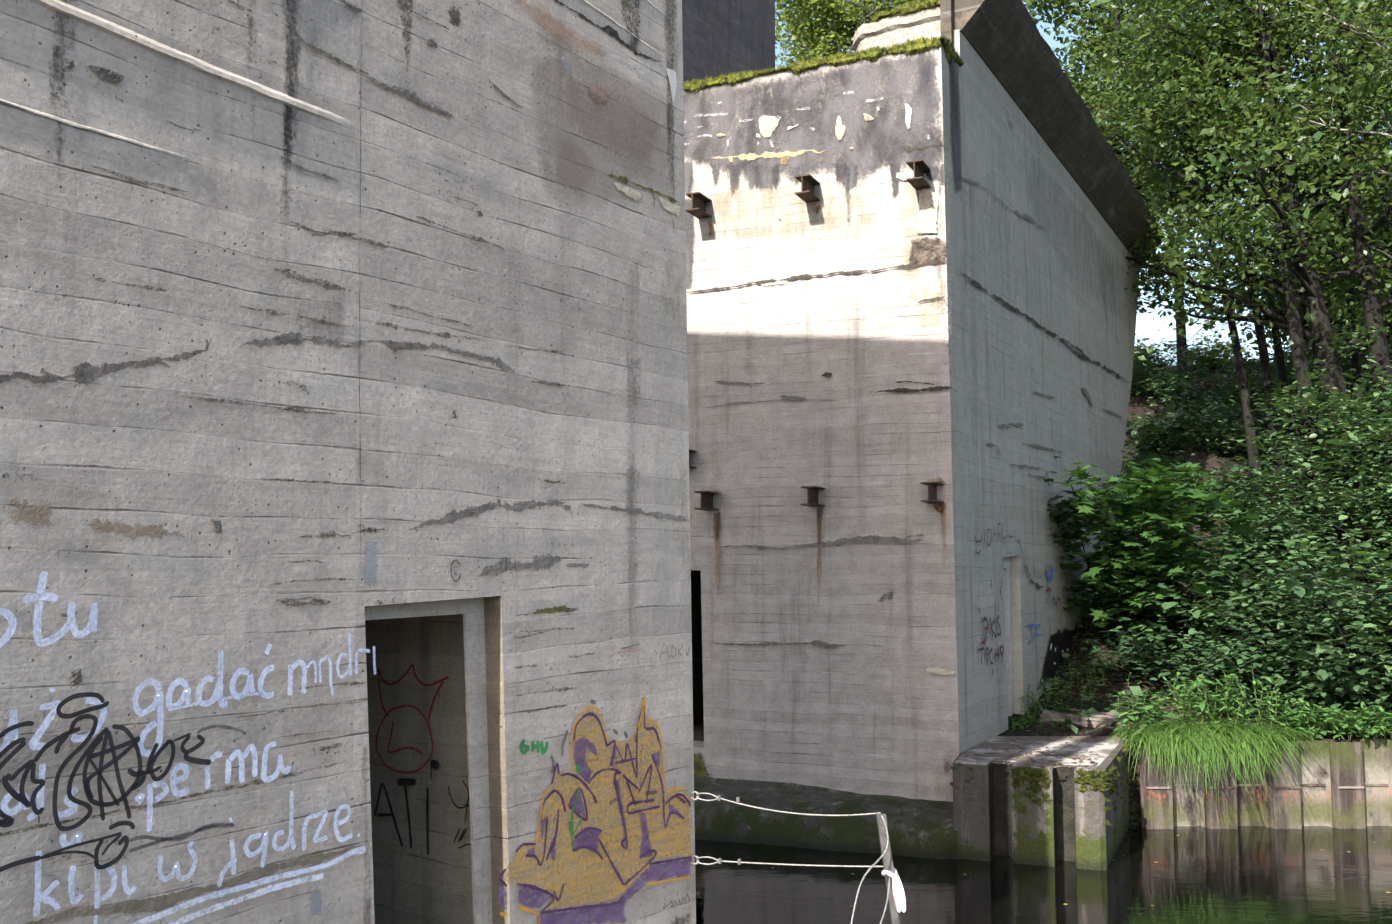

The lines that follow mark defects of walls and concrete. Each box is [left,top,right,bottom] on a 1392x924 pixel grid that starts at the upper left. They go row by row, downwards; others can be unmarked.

damp [50,0,66,99]
damp [283,0,300,208]
damp [923,59,962,201]
damp [831,164,857,226]
damp [890,163,900,197]
crack [687,262,1129,383]
rust [933,503,946,535]